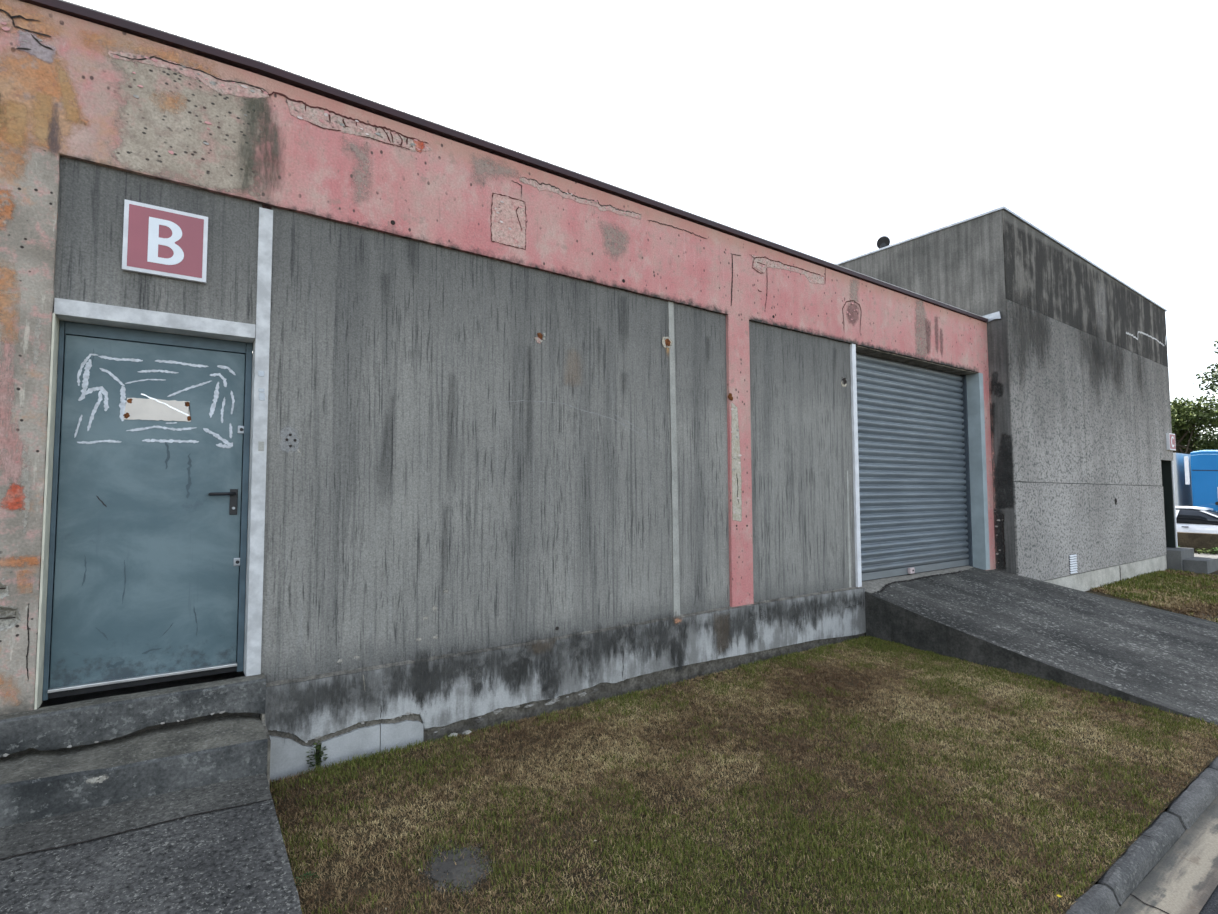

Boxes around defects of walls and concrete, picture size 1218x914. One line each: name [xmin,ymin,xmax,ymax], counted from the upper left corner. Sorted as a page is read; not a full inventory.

spalling [0,11,56,63]
peeling [108,51,269,199]
peeling [519,176,641,255]
peeling [751,255,825,284]
crack [1126,331,1166,346]
spalling [0,578,21,631]
water stain [656,620,687,667]
water stain [470,666,483,695]
crack [0,675,422,759]